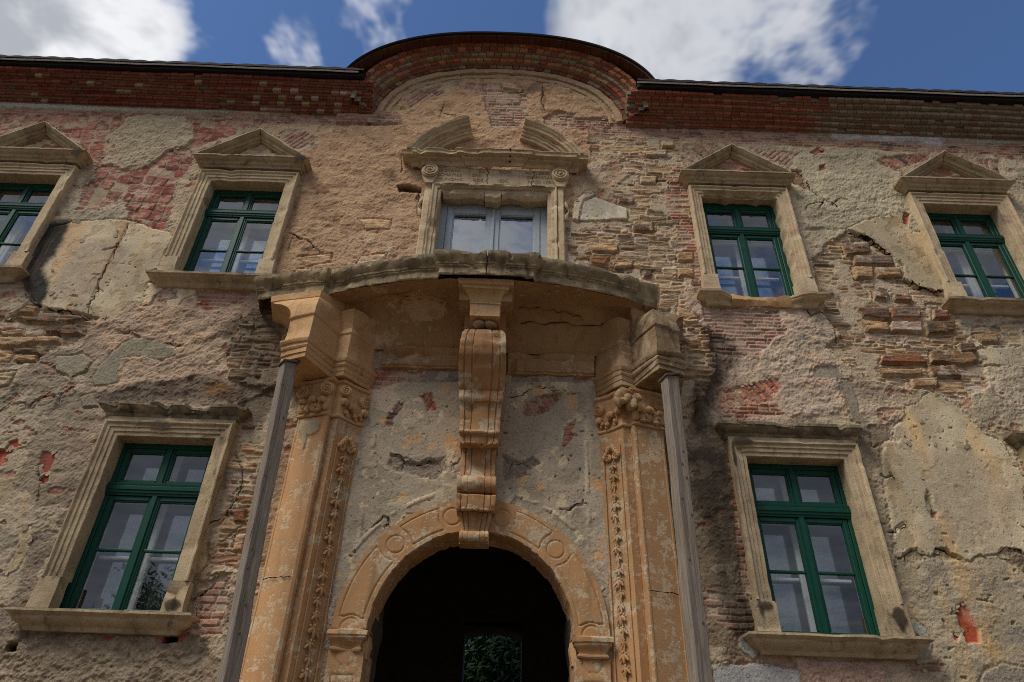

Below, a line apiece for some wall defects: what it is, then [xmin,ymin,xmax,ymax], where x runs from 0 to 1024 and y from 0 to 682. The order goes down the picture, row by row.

spalling [0,111,265,319]
crack [25,226,128,321]
peeling [848,212,943,291]
crack [519,307,603,326]
spalling [702,303,788,360]
spalling [717,379,781,413]
spalling [0,438,19,466]
spalling [388,453,442,480]
peeling [884,391,1024,573]
crack [888,524,959,560]
spalling [198,572,232,635]
spalling [953,603,982,643]